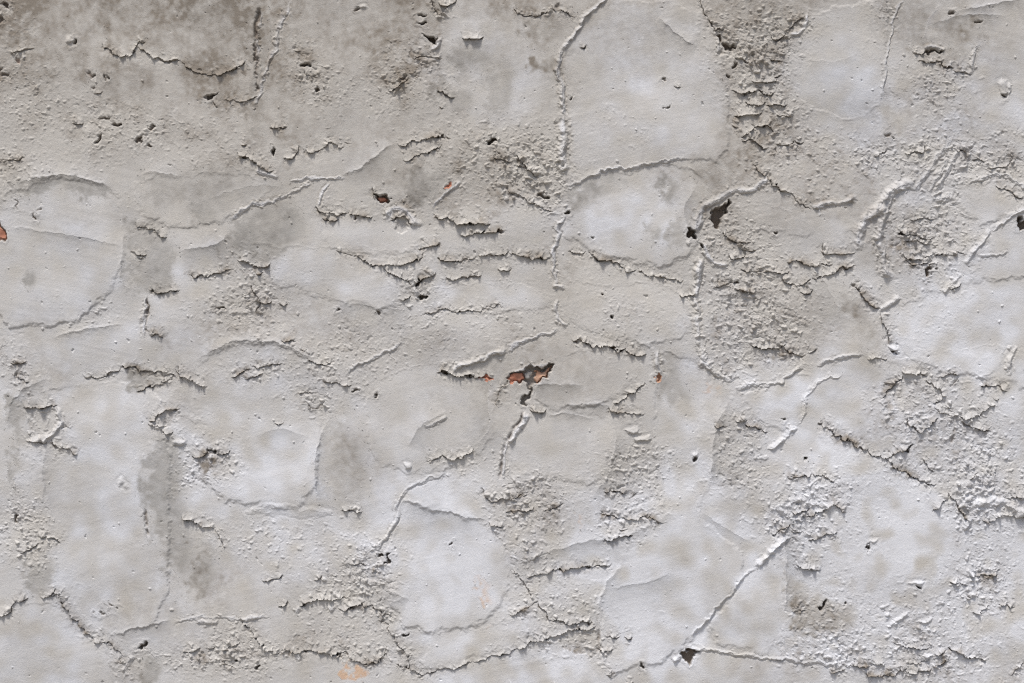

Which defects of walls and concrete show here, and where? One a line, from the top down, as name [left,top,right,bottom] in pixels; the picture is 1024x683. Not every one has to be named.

crack [513,3,578,23]
spalling [711,13,813,156]
flaking render [396,129,453,164]
flaking render [313,187,552,305]
spalling [686,211,856,384]
flaking render [507,361,552,384]
spalling [880,366,962,437]
crack [933,401,996,446]
spalling [477,473,565,531]
spalling [768,499,850,545]
crack [819,417,972,523]
spalling [959,448,1024,524]